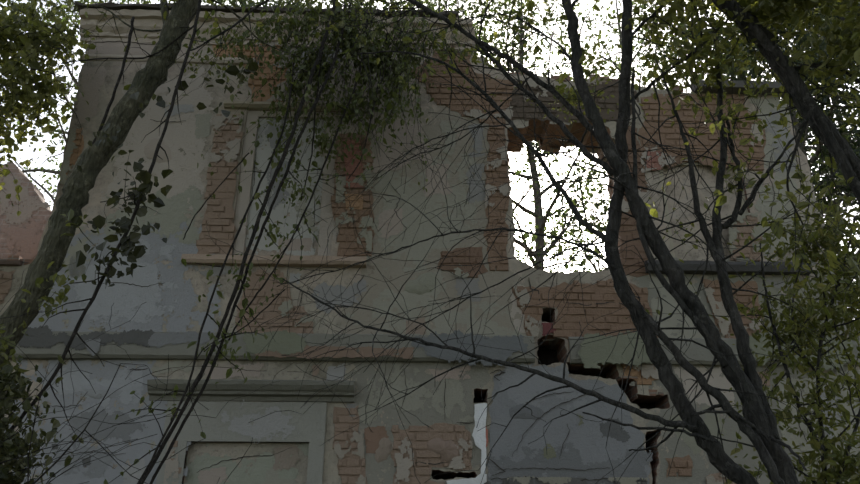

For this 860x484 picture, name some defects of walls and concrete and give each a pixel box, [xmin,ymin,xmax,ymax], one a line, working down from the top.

flaking render [84,41,156,70]
spalling [177,42,288,102]
flaking render [0,161,51,259]
flaking render [100,65,453,257]
spalling [412,46,590,278]
spalling [626,88,802,261]
spalling [235,269,314,334]
flaking render [202,345,414,380]
spalling [510,278,659,410]
spalling [619,192,704,338]
spalling [333,405,368,484]
spalling [391,398,620,484]